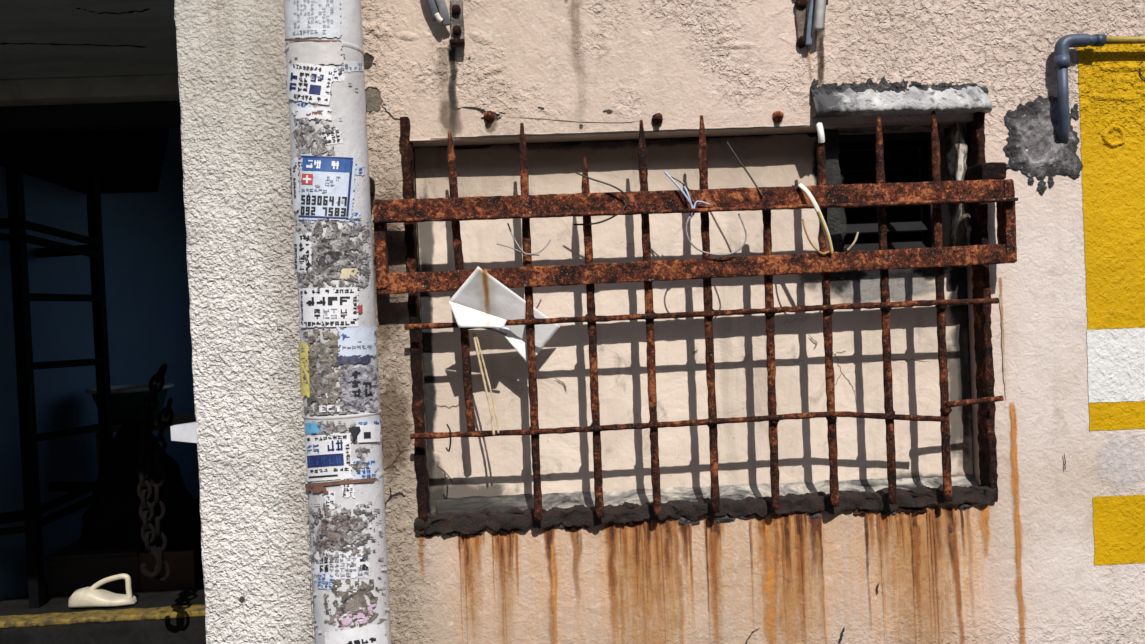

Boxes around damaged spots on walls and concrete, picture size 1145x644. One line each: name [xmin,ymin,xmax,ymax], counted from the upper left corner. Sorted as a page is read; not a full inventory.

damp [439,43,457,130]
corrosion [458,531,518,619]
corrosion [544,525,557,644]
corrosion [571,529,582,569]
corrosion [606,517,724,644]
corrosion [750,511,826,644]
corrosion [865,505,989,622]
corrosion [1010,404,1025,644]